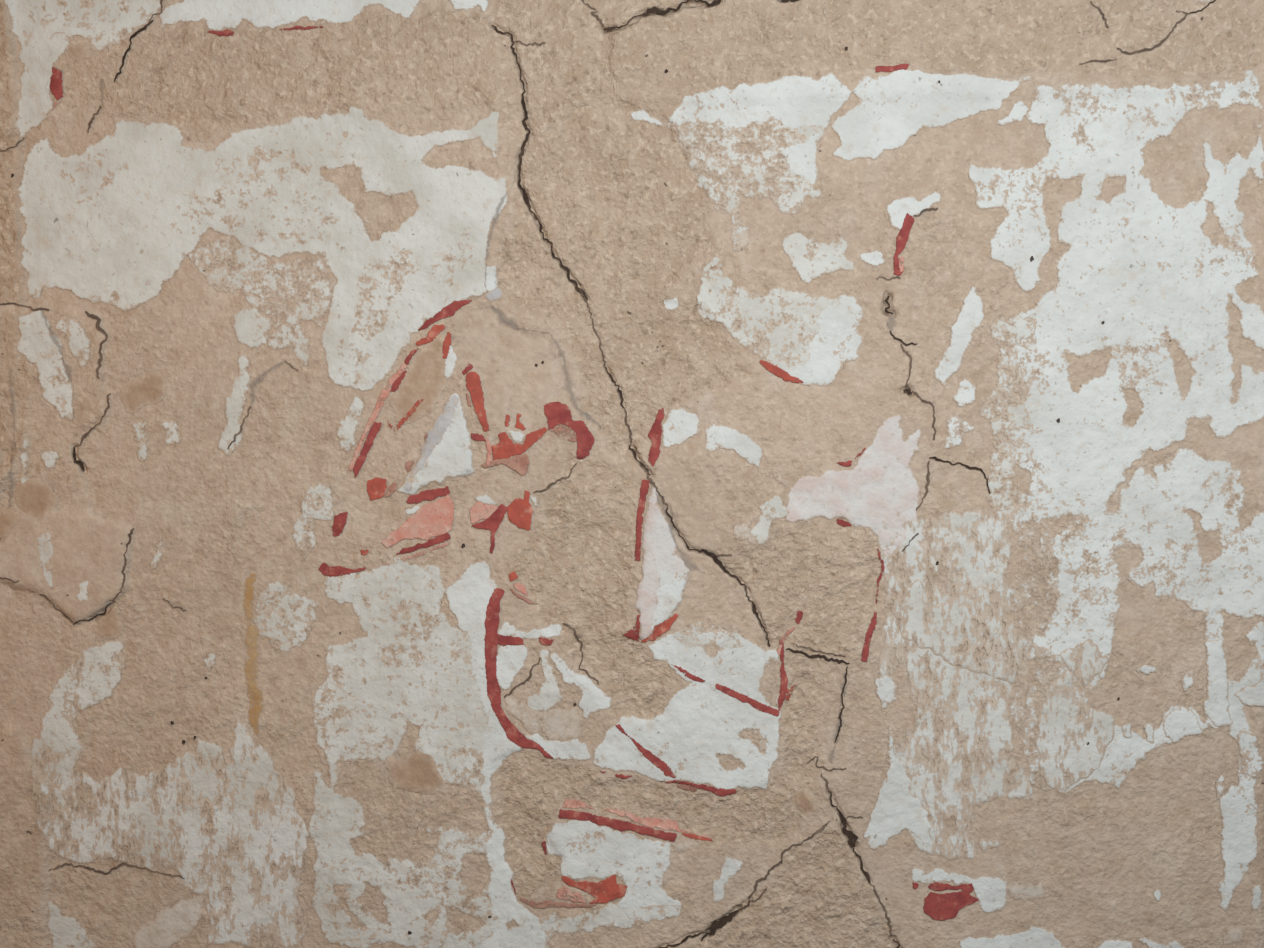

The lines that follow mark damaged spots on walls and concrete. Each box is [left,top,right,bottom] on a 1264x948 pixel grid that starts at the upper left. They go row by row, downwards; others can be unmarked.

crack [88,0,163,133]
crack [582,0,721,31]
crack [1080,0,1216,64]
crack [73,311,111,471]
peeling [0,0,1264,725]
crack [491,25,900,948]
crack [877,276,991,552]
peeling [721,69,1264,913]
crack [1,528,134,625]
peeling [30,556,905,948]
peeling [959,926,1066,948]
peeling [1097,937,1186,948]